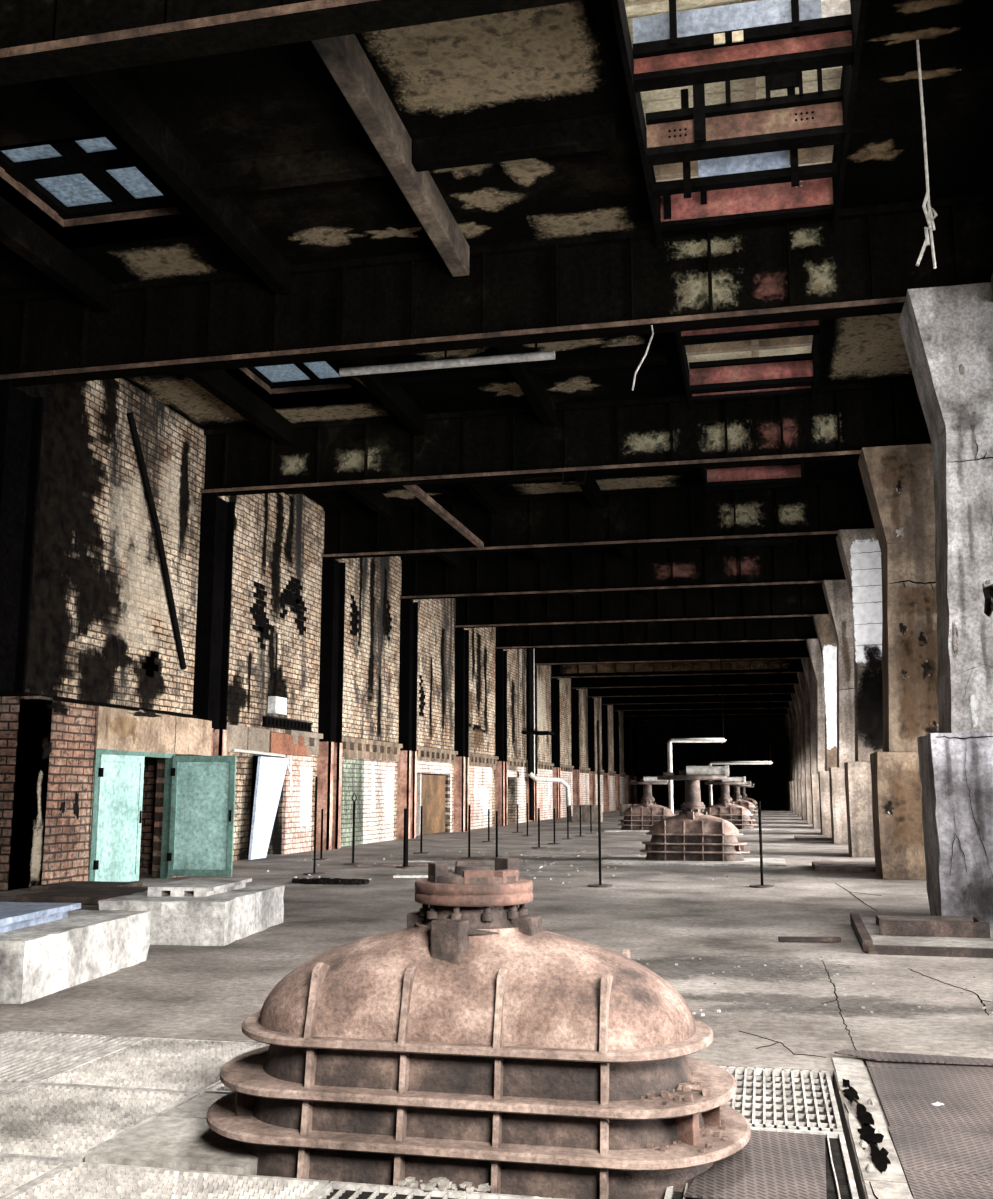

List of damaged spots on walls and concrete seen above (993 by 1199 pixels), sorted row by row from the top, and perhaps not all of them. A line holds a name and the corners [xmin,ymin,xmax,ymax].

peeling [366,1,596,112]
peeling [292,226,424,246]
peeling [435,158,552,238]
peeling [528,208,632,237]
leakage [178,440,191,557]
leakage [261,493,294,696]
leakage [48,700,68,715]
leakage [42,738,52,760]
crack [821,957,857,1050]
crack [908,968,991,1016]
crack [739,1031,826,1058]
spalling [843,1079,891,1173]